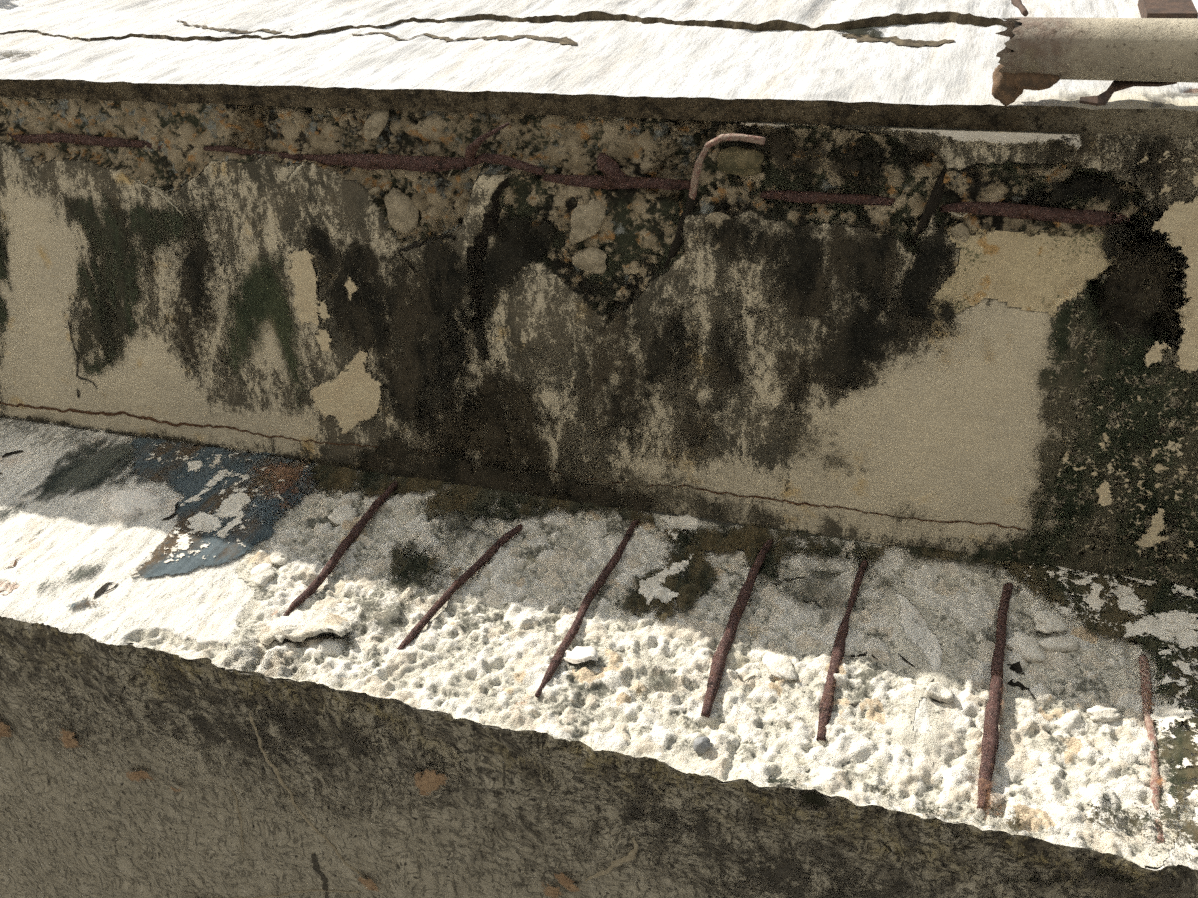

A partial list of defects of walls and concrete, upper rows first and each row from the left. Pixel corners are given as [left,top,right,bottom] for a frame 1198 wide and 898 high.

damp [0,41,70,60]
crack [0,11,1008,47]
spalling [0,97,1198,379]
peeling [310,350,382,434]
damp [0,125,1198,642]
peeling [1057,403,1198,567]
rust [391,523,523,656]
rust [514,520,640,710]
damp [630,660,685,700]
spalling [124,444,1198,868]
rust [816,557,868,742]
rust [970,582,1013,815]